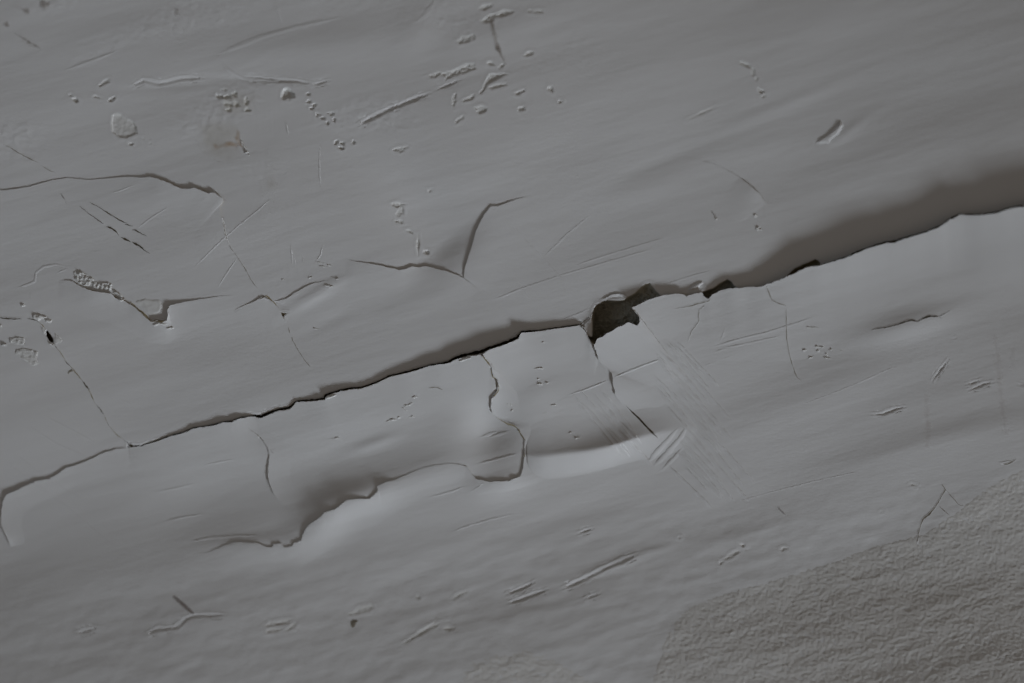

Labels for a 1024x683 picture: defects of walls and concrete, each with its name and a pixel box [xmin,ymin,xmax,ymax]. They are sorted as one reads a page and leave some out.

crack [79,202,150,254]
crack [824,204,1024,264]
crack [122,297,166,323]
crack [222,218,310,367]
crack [765,286,801,381]
crack [872,310,950,331]
crack [0,314,593,457]
peeling [1,196,1024,573]
crack [626,406,659,439]
crack [916,484,963,543]